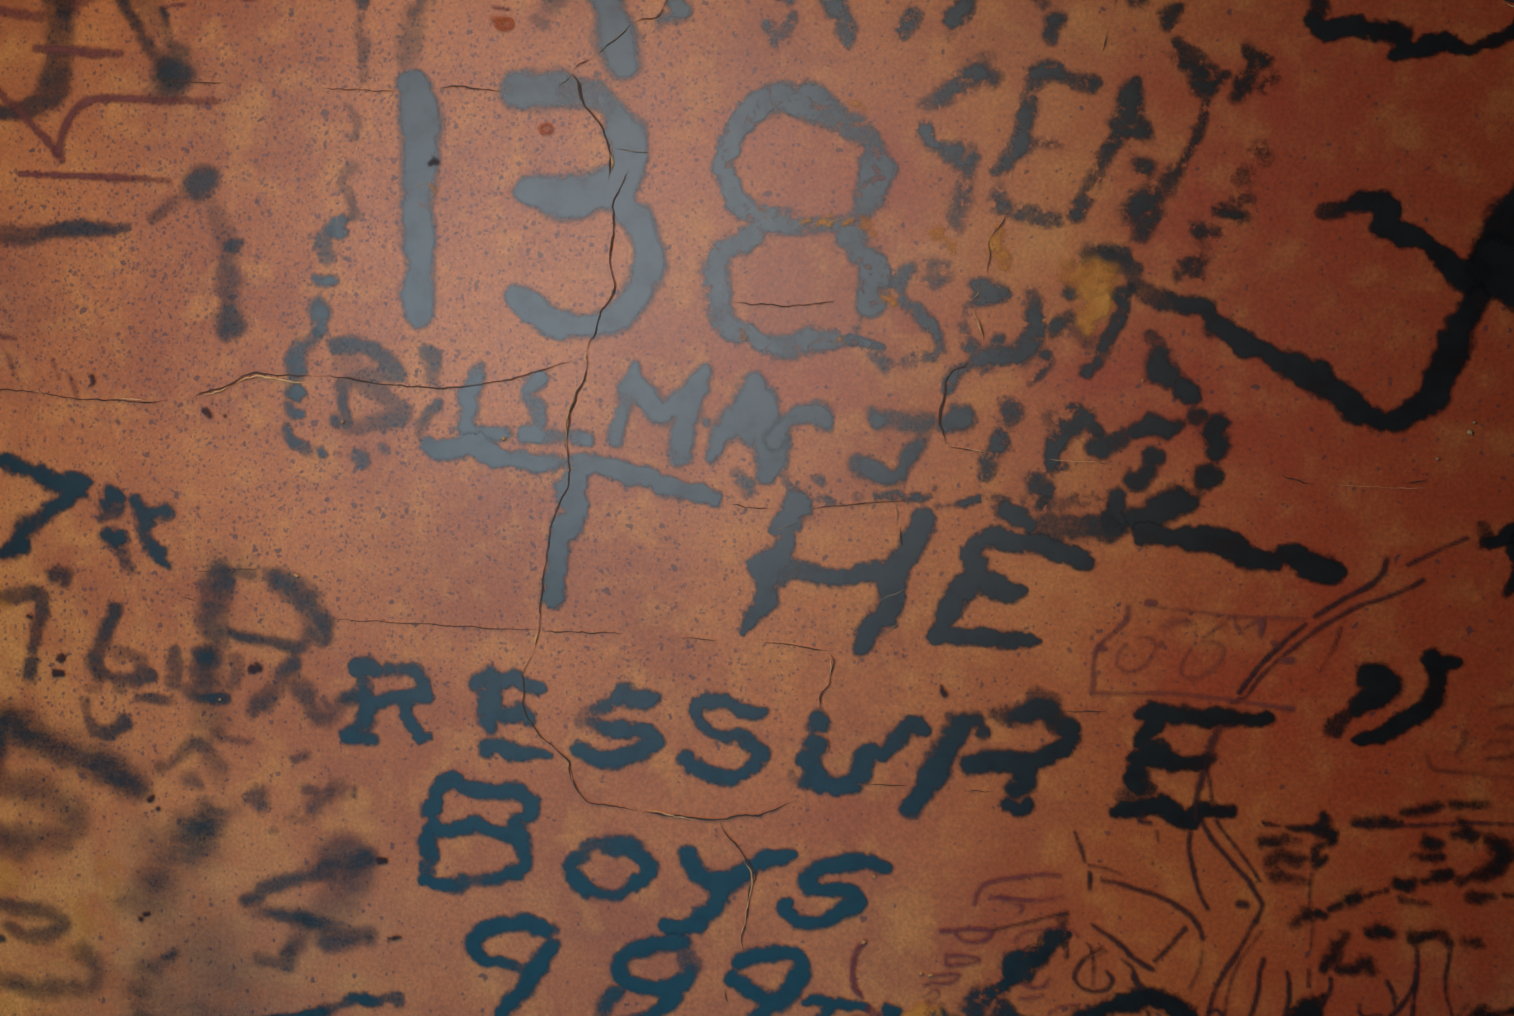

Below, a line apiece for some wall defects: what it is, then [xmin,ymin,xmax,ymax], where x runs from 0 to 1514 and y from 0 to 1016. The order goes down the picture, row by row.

crack [737,299,834,307]
crack [0,0,794,951]
crack [730,500,904,542]
crack [765,642,835,756]